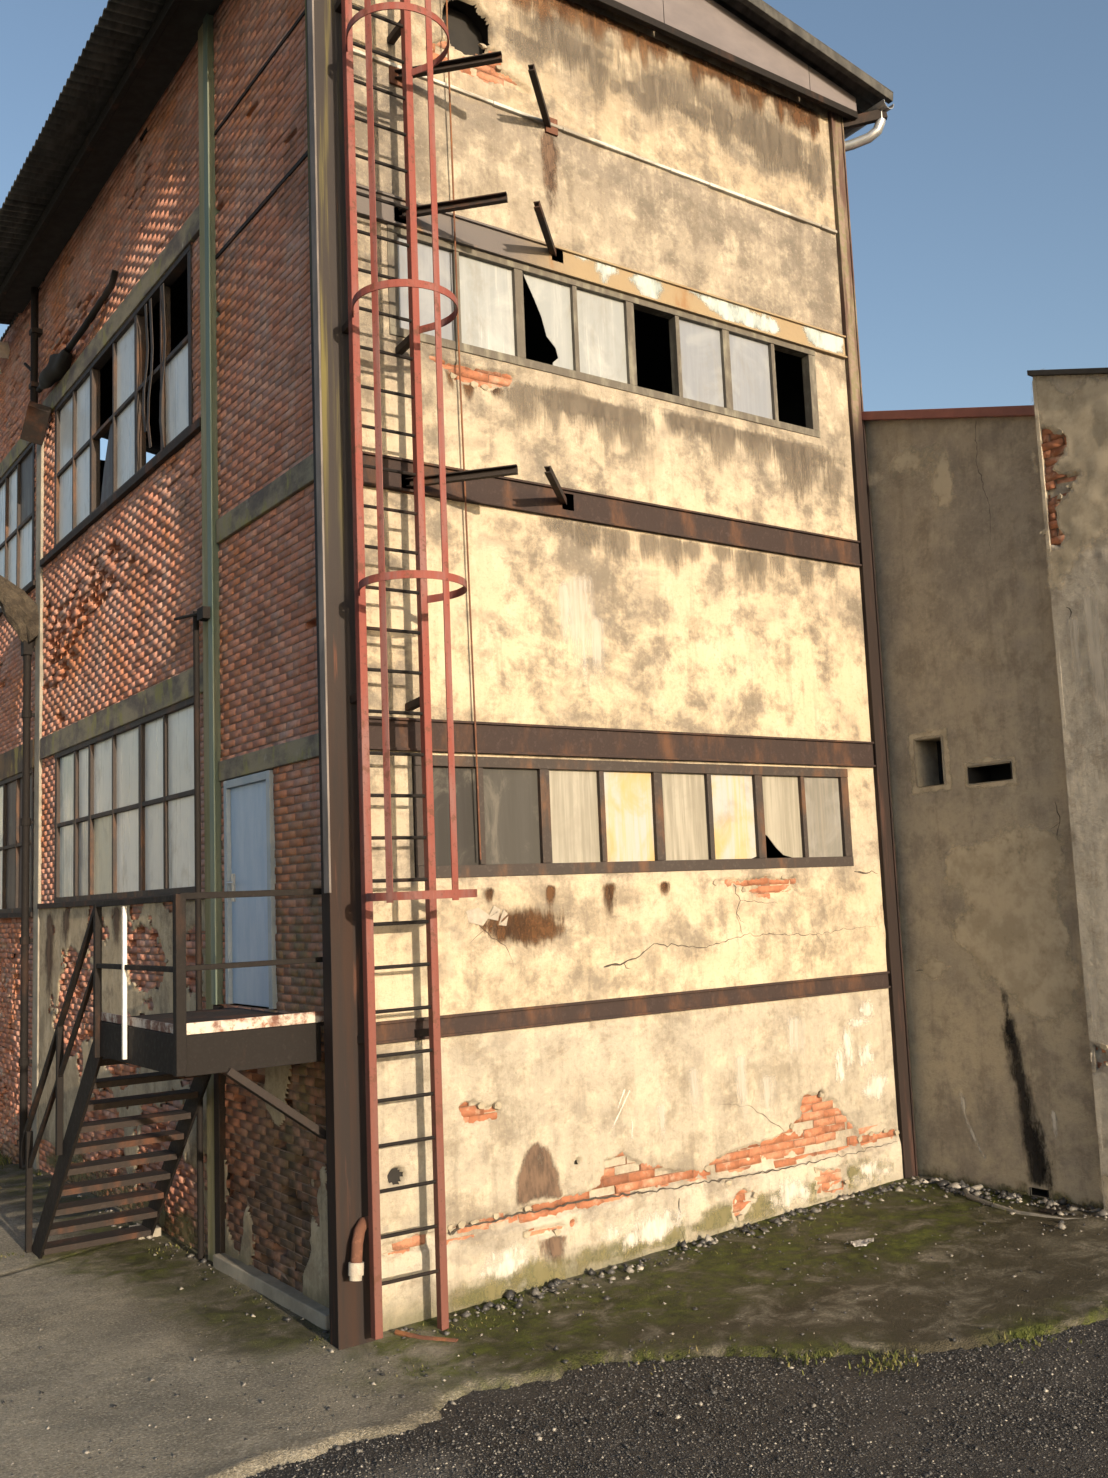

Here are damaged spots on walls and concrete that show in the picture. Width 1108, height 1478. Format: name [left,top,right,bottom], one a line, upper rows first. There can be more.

spalling [432,0,521,93]
flaking render [429,356,513,390]
peeling [1036,376,1108,588]
leakage [554,520,835,584]
peeling [466,906,508,926]
crack [604,884,876,969]
flaking render [712,875,796,899]
leakage [1000,984,1052,1186]
spalling [387,1168,403,1185]
flaking render [446,1091,900,1245]
flaking render [383,1234,426,1255]